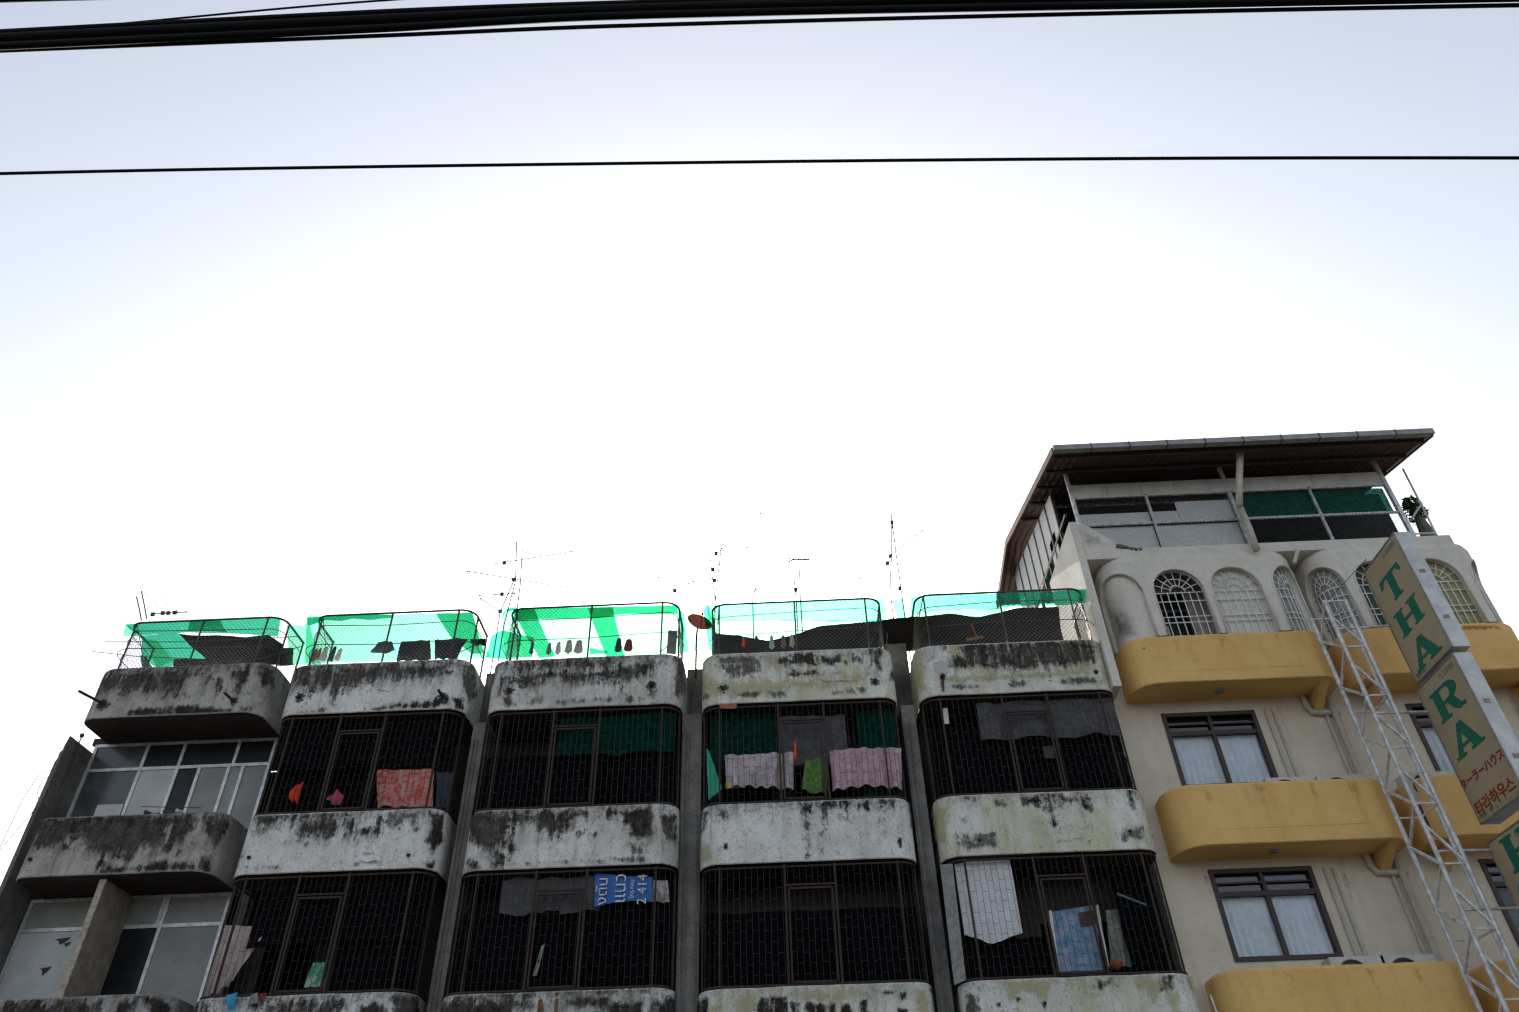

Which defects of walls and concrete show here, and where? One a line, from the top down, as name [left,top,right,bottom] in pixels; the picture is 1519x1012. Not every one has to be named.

leakage [96,656,708,715]
leakage [717,648,894,697]
leakage [940,640,1096,690]
leakage [26,814,229,873]
leakage [257,811,444,868]
leakage [466,806,679,869]
leakage [800,799,913,858]
leakage [961,793,1094,827]
leakage [0,996,171,1012]
leakage [247,994,420,1012]
leakage [441,993,536,1012]
leakage [555,989,676,1012]